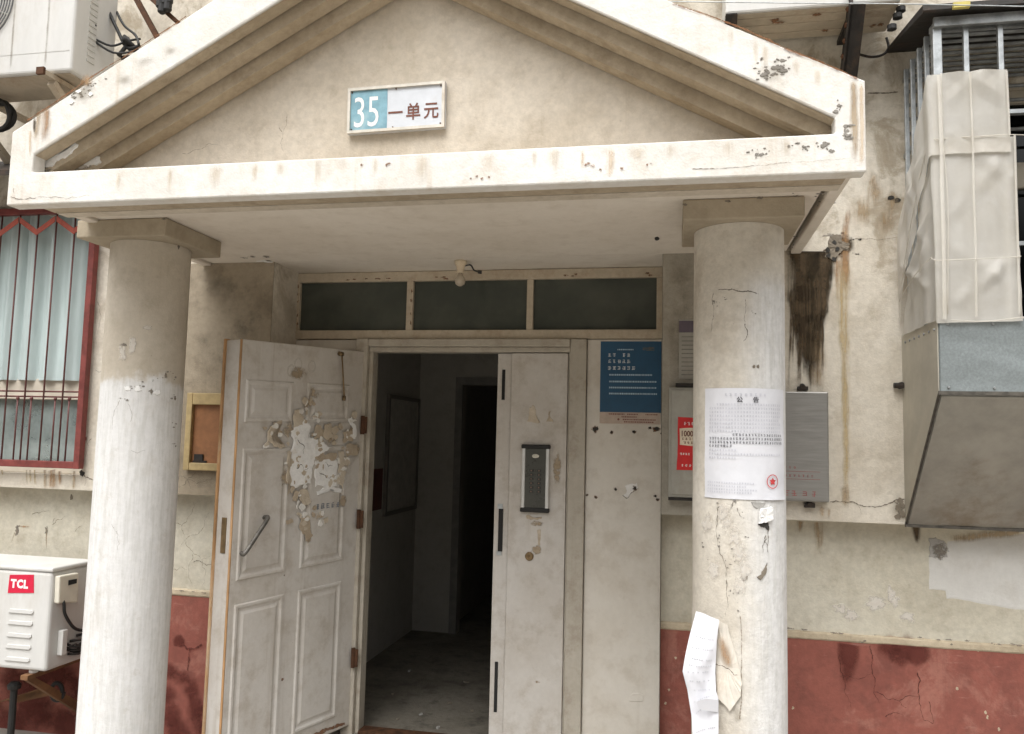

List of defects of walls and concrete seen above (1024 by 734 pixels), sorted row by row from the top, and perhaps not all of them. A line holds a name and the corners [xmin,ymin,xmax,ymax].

peeling [753,57,790,80]
peeling [69,77,107,104]
spalling [823,232,862,262]
corrosion [836,217,849,353]
crack [711,289,757,340]
damp [788,251,833,381]
peeling [124,371,176,401]
crack [830,499,904,510]
spalling [928,537,948,560]
damp [839,643,858,680]
damp [880,644,928,664]
crack [838,646,934,724]